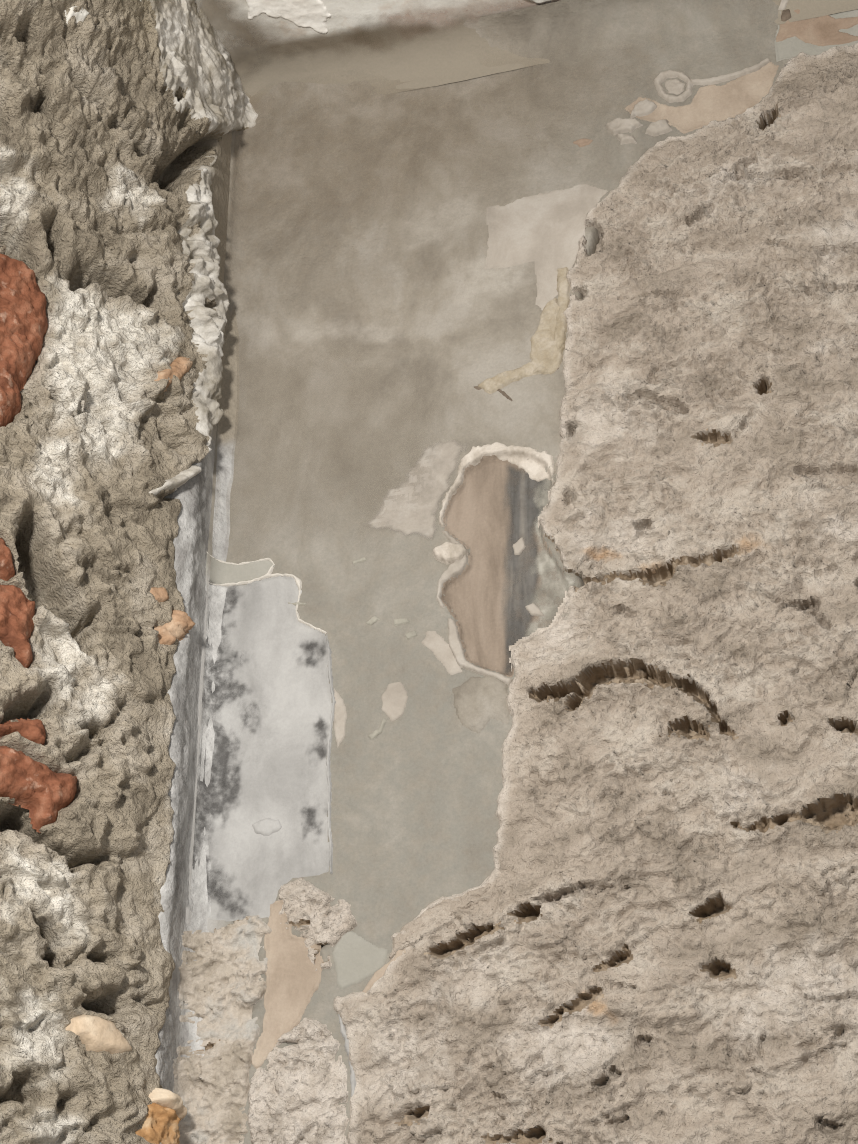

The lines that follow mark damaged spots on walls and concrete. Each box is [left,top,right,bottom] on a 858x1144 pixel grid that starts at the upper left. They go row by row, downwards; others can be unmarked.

spalling [0,0,258,1144]
spalling [173,0,858,1144]
water stain [202,589,244,709]
water stain [305,643,324,665]
water stain [192,720,239,869]
water stain [316,721,326,757]
water stain [207,871,243,913]